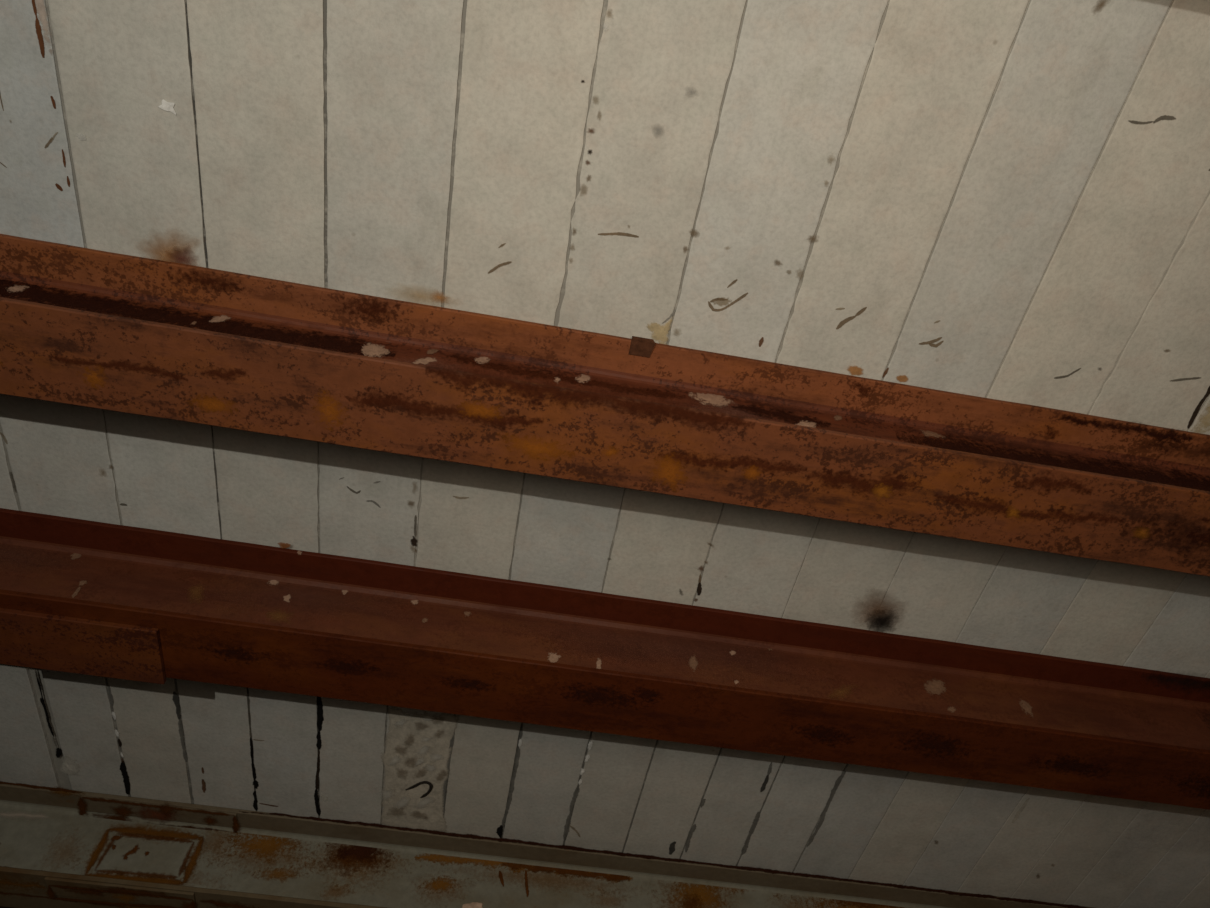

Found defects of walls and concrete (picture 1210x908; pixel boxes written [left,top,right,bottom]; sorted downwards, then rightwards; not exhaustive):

rust [0,280,365,356]
rust [629,336,655,357]
rust [349,355,830,430]
rust [1047,416,1192,441]
rust [659,451,915,497]
rust [896,433,1210,494]
rust [935,495,1122,524]
crack [107,685,115,706]
crack [178,719,188,762]
rust [0,781,1087,908]